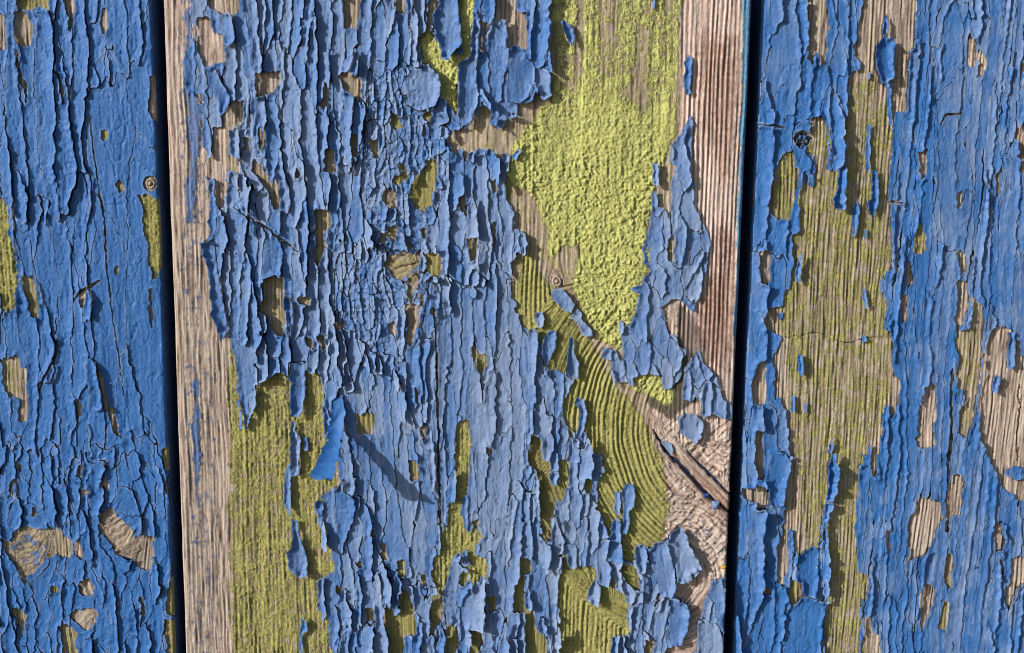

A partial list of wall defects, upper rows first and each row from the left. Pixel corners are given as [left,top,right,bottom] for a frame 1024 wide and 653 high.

peeling [0,0,176,653]
crack [75,123,124,393]
crack [435,310,443,627]
peeling [164,0,751,653]
peeling [733,0,1024,653]